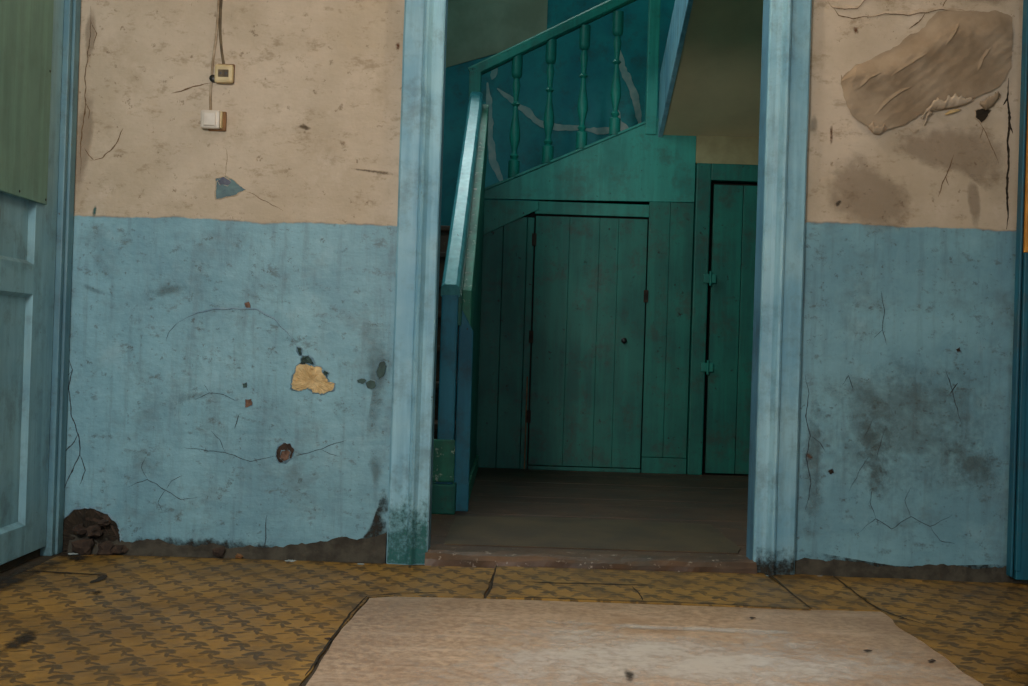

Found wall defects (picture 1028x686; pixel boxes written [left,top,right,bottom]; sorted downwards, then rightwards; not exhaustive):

crack [828,0,975,29]
crack [979,78,1013,229]
peeling [214,175,246,200]
flaking render [290,346,336,396]
peeling [275,442,295,464]
hole [62,506,128,555]